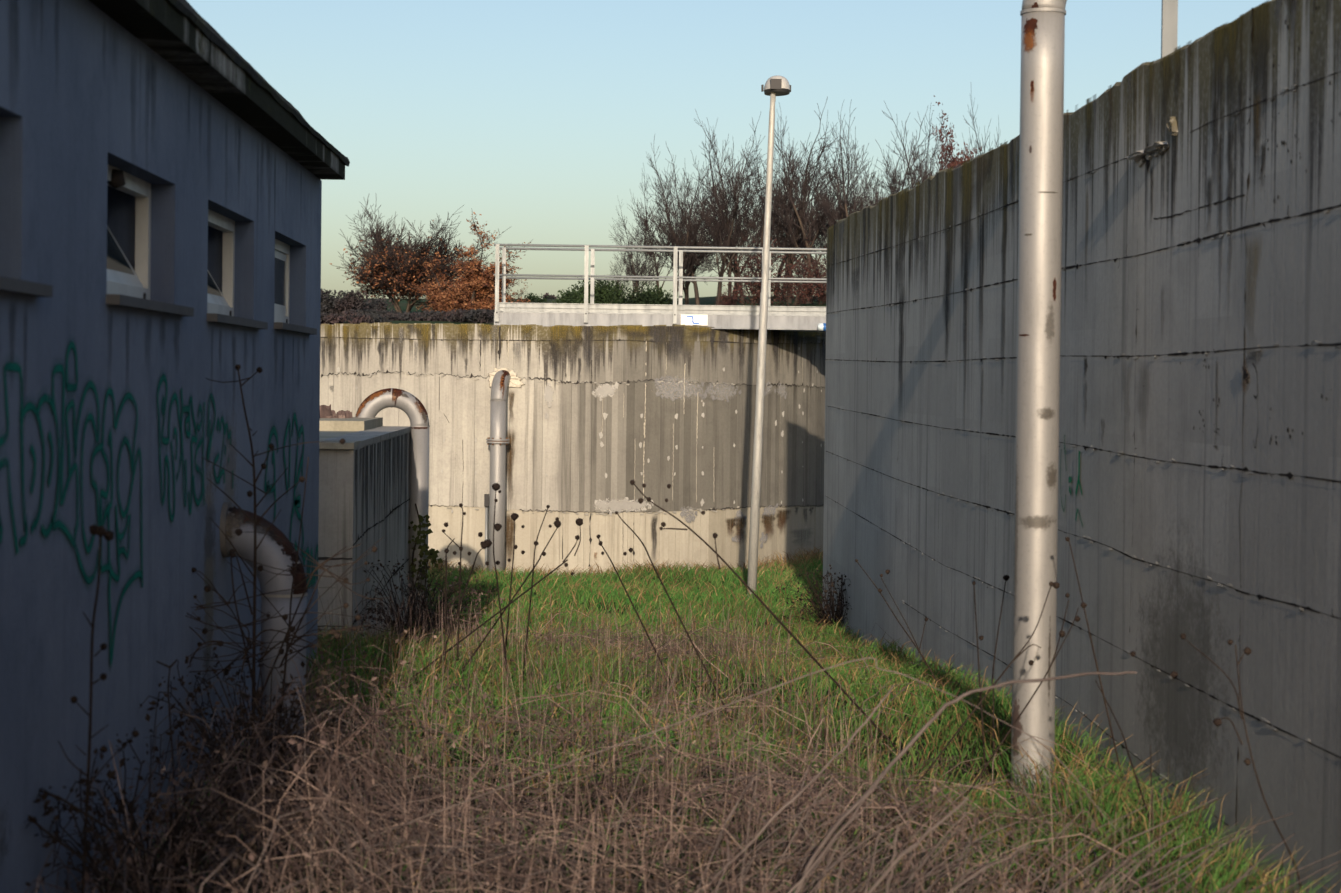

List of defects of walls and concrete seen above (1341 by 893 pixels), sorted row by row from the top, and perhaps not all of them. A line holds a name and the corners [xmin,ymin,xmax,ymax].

rust [1024,2,1039,36]
leakage [1128,41,1191,135]
leakage [1207,0,1297,264]
leakage [1150,136,1176,207]
leakage [827,137,1018,371]
leakage [321,324,435,363]
leakage [458,324,491,366]
leakage [550,326,744,374]
leakage [773,330,826,376]
rust [356,388,428,429]
peeling [654,367,742,419]
rust [228,507,308,595]